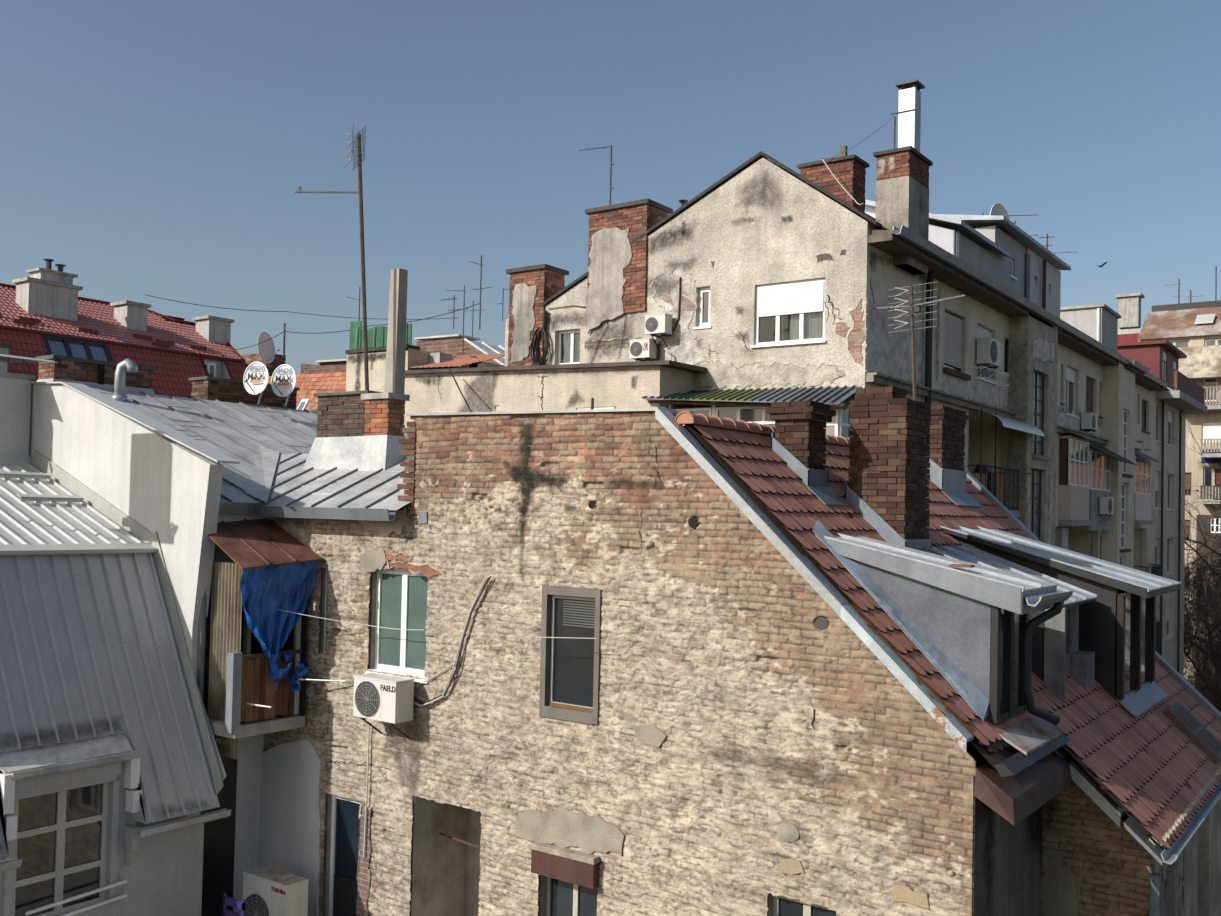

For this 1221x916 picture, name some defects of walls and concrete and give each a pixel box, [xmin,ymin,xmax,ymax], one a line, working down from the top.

peeling [816,249,846,263]
peeling [650,266,925,390]
damp [460,374,496,412]
damp [507,423,565,536]
peeling [941,335,1055,526]